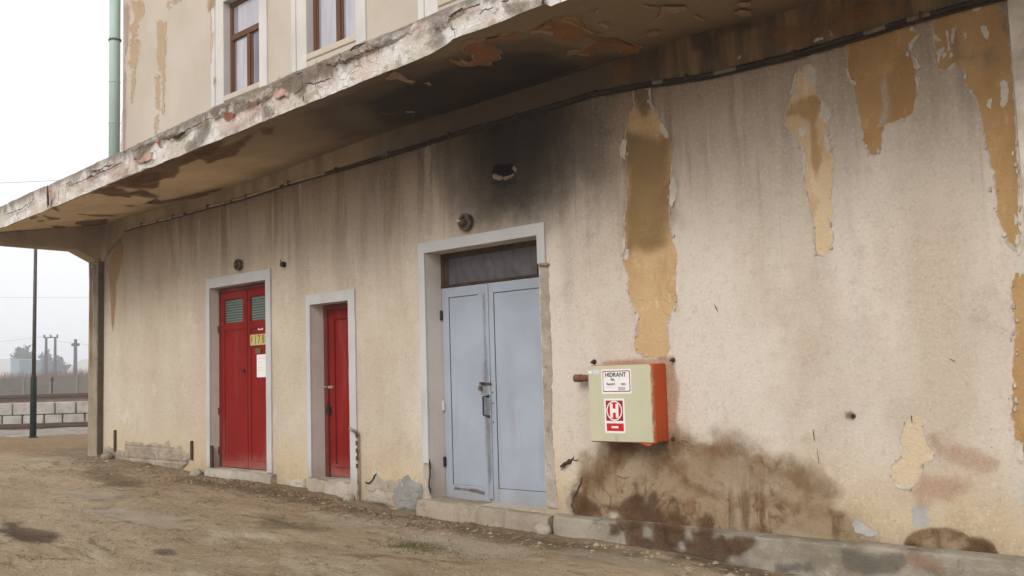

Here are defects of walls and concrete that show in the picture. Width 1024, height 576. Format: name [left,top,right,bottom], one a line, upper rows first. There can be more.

crack [5,158,127,215]
peeling [121,0,188,166]
leakage [29,59,334,228]
crack [164,117,215,141]
crack [294,47,379,101]
spalling [319,6,467,68]
crack [448,0,509,30]
peeling [619,88,680,360]
peeling [781,30,837,257]
peeling [843,2,1024,507]
leakage [572,433,866,562]
leakage [905,528,997,554]